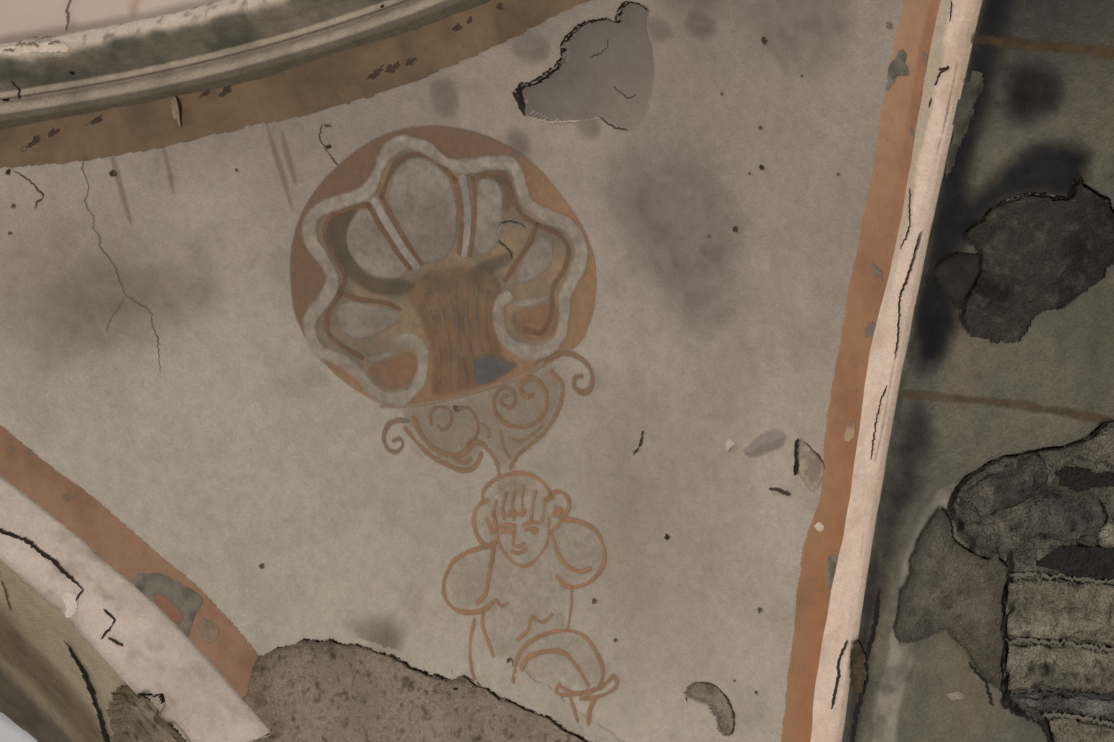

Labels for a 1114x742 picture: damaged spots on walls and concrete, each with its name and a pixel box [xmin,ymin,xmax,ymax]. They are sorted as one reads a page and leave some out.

peeling [506,0,652,130]
crack [13,169,44,209]
crack [79,137,160,366]
crack [894,188,921,359]
spalling [934,175,1114,344]
crack [870,386,887,458]
crack [0,528,123,647]
spalling [892,418,1114,742]
crack [63,640,109,742]
spalling [105,686,187,742]
spalling [242,627,624,742]
spalling [682,675,736,736]